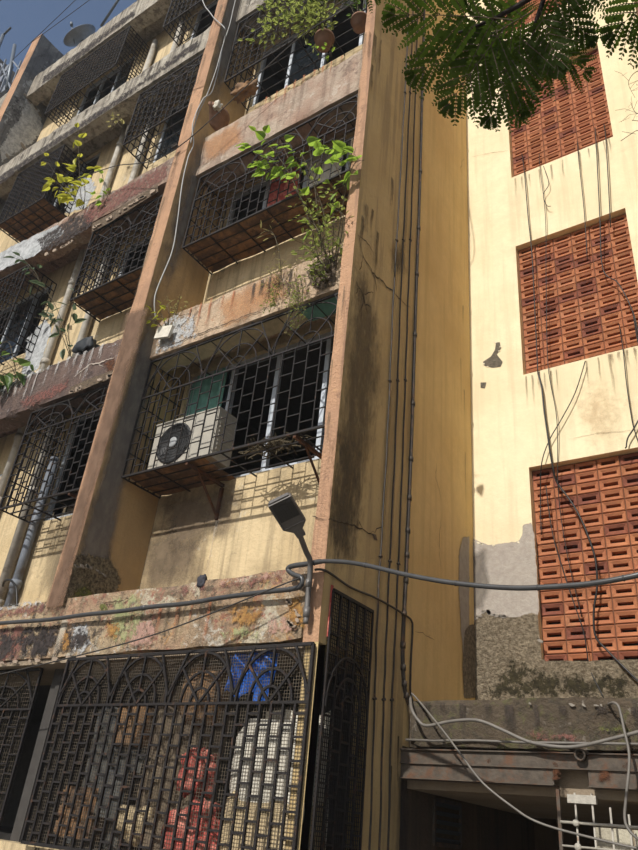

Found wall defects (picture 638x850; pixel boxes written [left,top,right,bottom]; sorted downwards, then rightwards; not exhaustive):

peeling [0,93,43,163]
crack [356,237,409,316]
damp [0,303,197,611]
damp [332,281,378,555]
crack [313,516,384,537]
damp [0,620,96,664]
peeling [463,609,638,707]